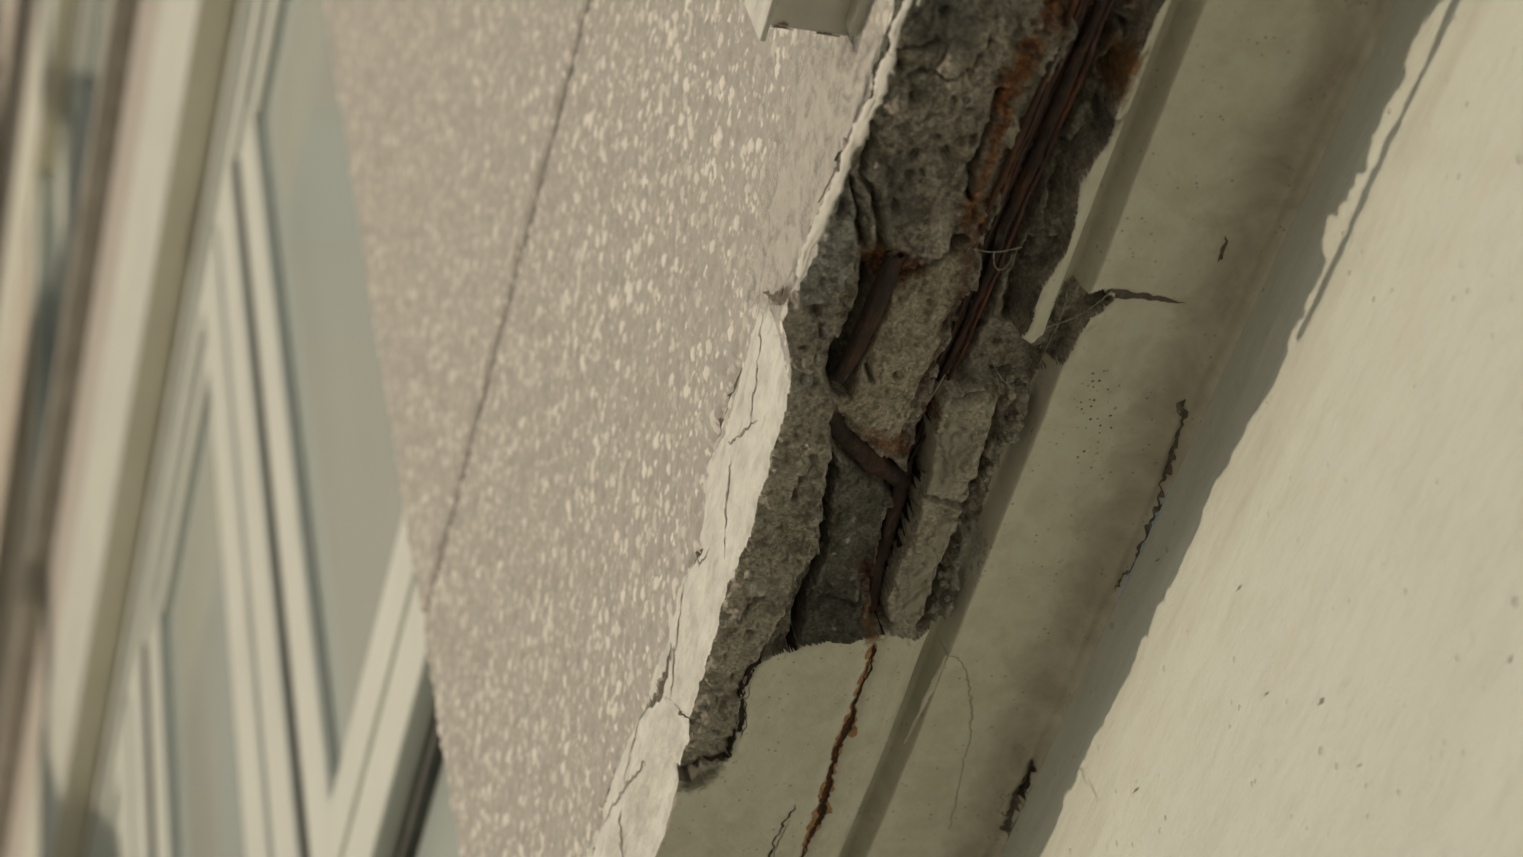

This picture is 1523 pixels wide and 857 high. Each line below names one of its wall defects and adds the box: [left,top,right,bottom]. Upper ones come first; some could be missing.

corrosion [942,0,1066,326]
corrosion [1097,23,1147,98]
spalling [677,0,1166,781]
crack [1095,289,1184,303]
crack [1115,399,1189,590]
crack [768,644,877,857]